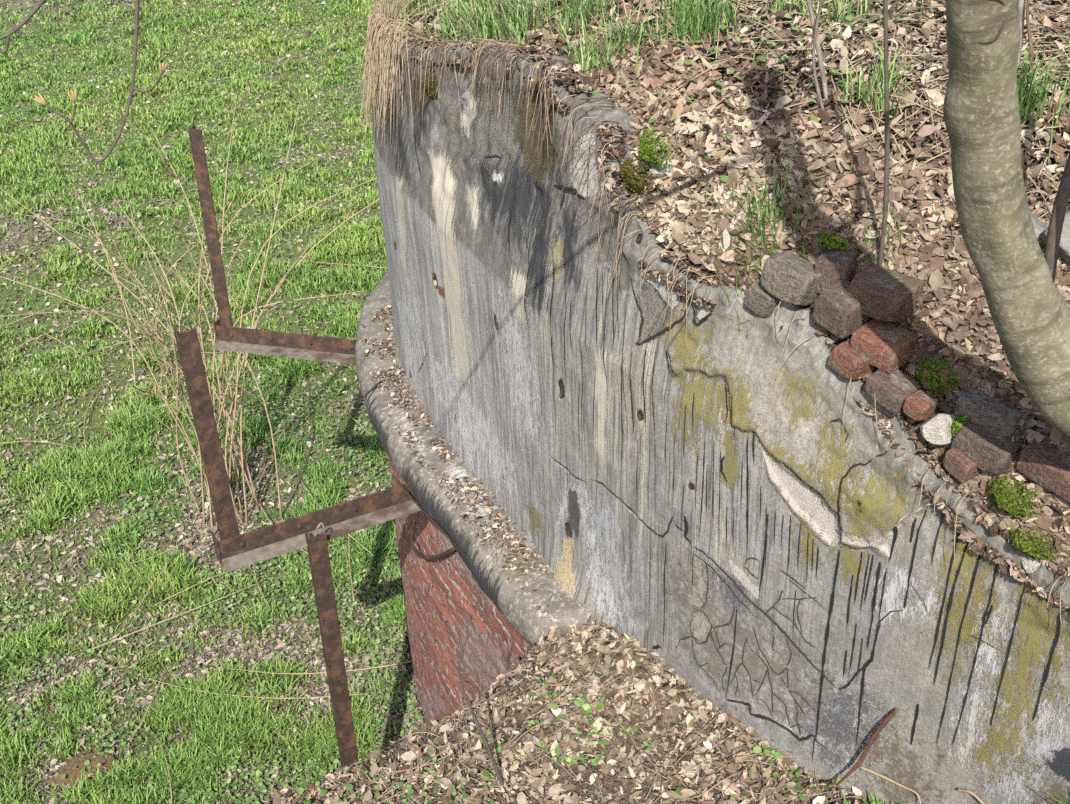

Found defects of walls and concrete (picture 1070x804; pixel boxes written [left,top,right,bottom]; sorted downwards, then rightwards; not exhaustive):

water stain [380,66,694,537]
water stain [554,484,650,634]
crack [524,450,867,748]
spalling [758,439,933,560]
water stain [672,397,1070,804]
crack [874,586,929,636]